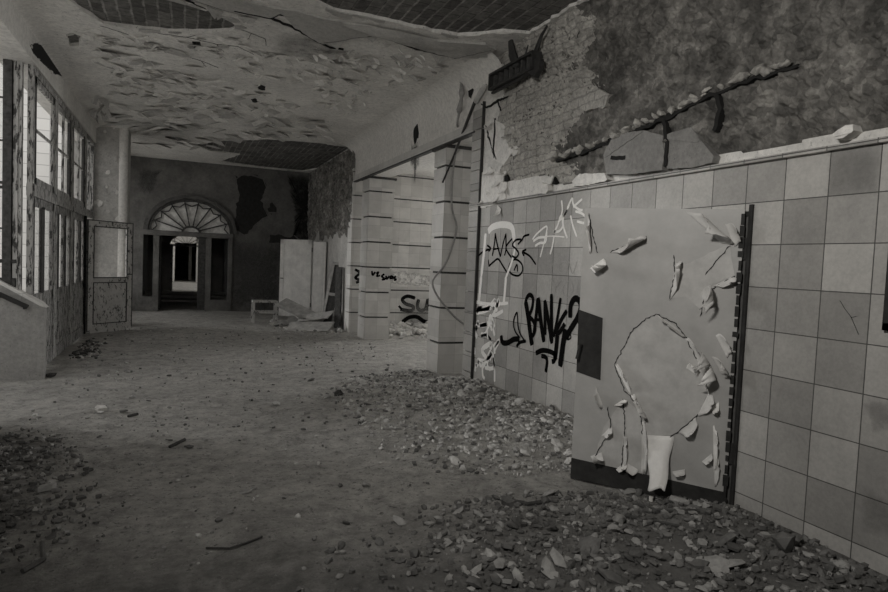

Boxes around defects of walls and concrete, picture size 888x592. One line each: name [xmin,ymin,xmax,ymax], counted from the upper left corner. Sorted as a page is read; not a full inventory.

spalling [30,43,63,77]
crack [158,0,373,68]
crack [395,42,487,59]
spalling [66,0,888,244]
peeling [585,212,745,504]